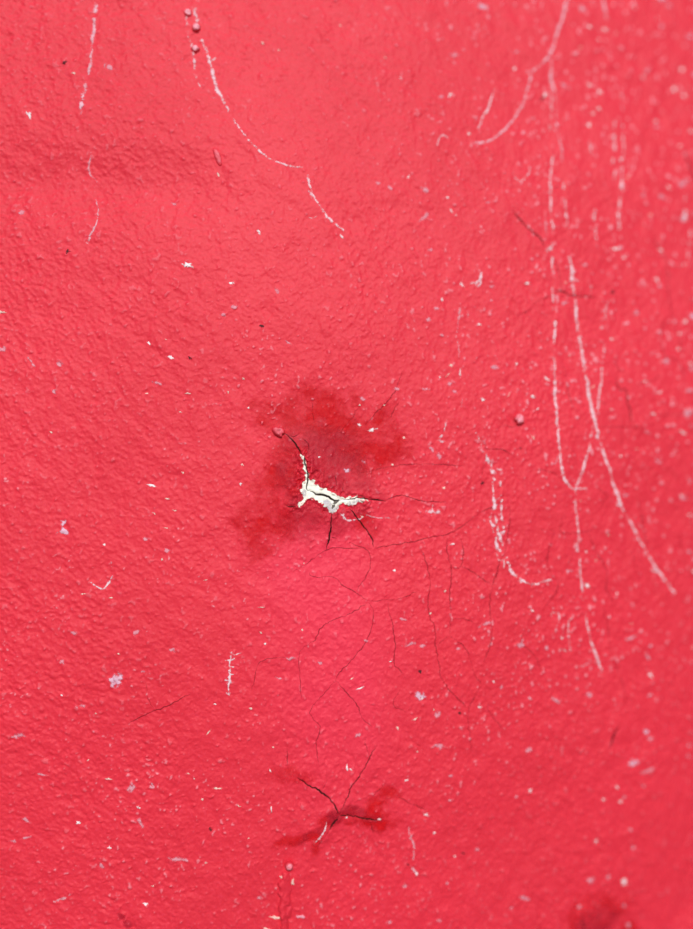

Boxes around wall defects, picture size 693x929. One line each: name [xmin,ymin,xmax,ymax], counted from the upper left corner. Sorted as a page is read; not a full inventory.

peeling [286,434,435,545]
crack [315,586,397,705]
crack [298,746,377,830]